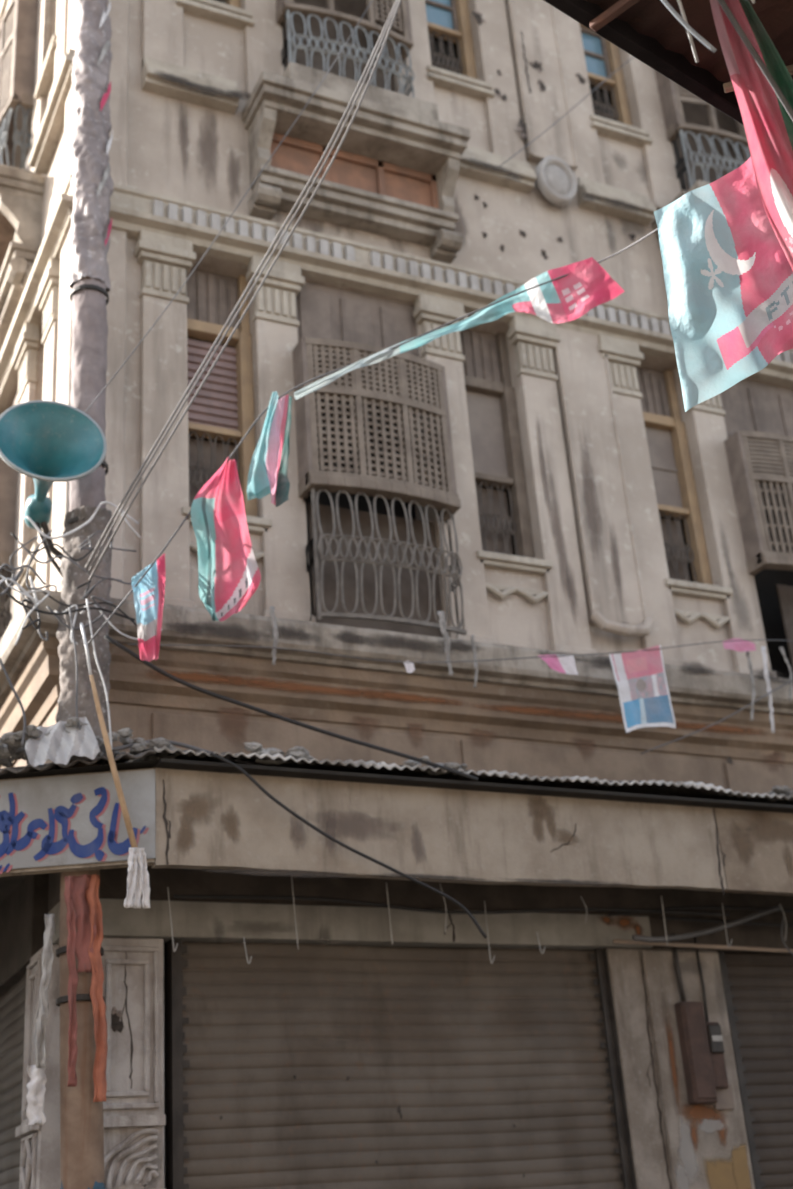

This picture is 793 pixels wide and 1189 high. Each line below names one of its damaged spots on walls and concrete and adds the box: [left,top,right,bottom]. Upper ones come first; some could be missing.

leakage [201,122,216,171]
leakage [230,159,238,193]
crack [162,779,171,865]
leakage [179,798,208,849]
leakage [225,814,237,838]
leakage [531,799,574,842]
crack [121,954,133,1088]
peeling [677,1119,752,1189]